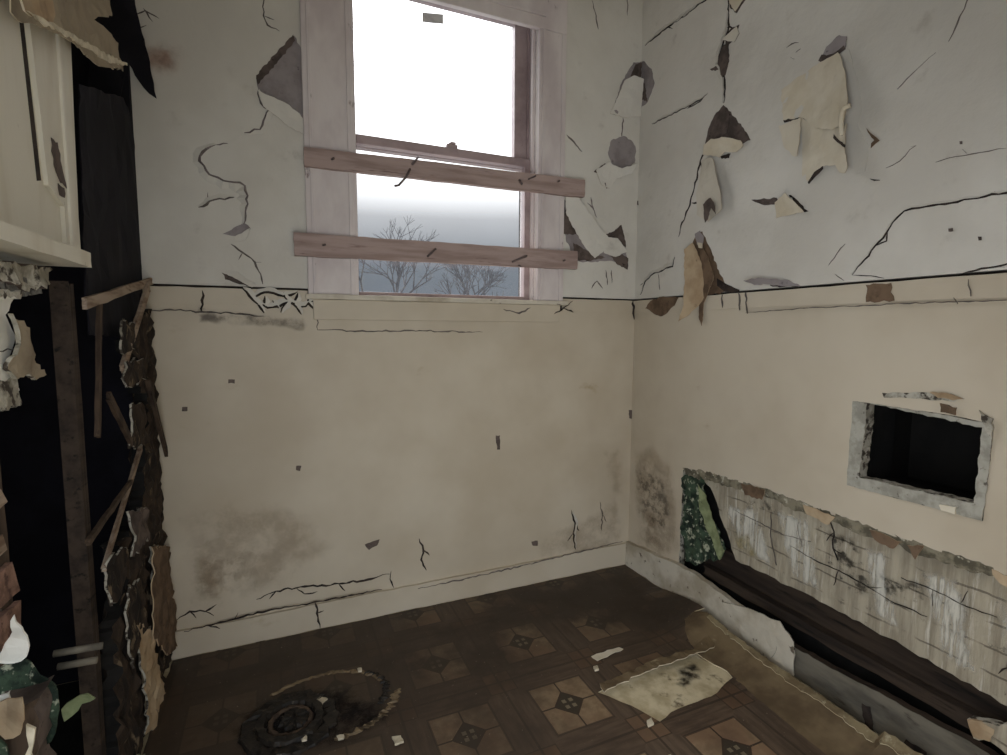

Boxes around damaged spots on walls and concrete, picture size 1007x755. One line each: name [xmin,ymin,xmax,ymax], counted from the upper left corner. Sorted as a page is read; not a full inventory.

peeling [256,35,303,134]
crack [645,0,739,124]
peeling [703,105,750,159]
flaking render [0,260,53,299]
crack [193,89,273,284]
peeling [564,197,628,270]
peeling [646,231,800,325]
crack [747,263,1007,313]
crack [829,190,1007,281]
crack [177,573,394,632]
spalling [680,468,1007,706]
crack [732,509,997,618]